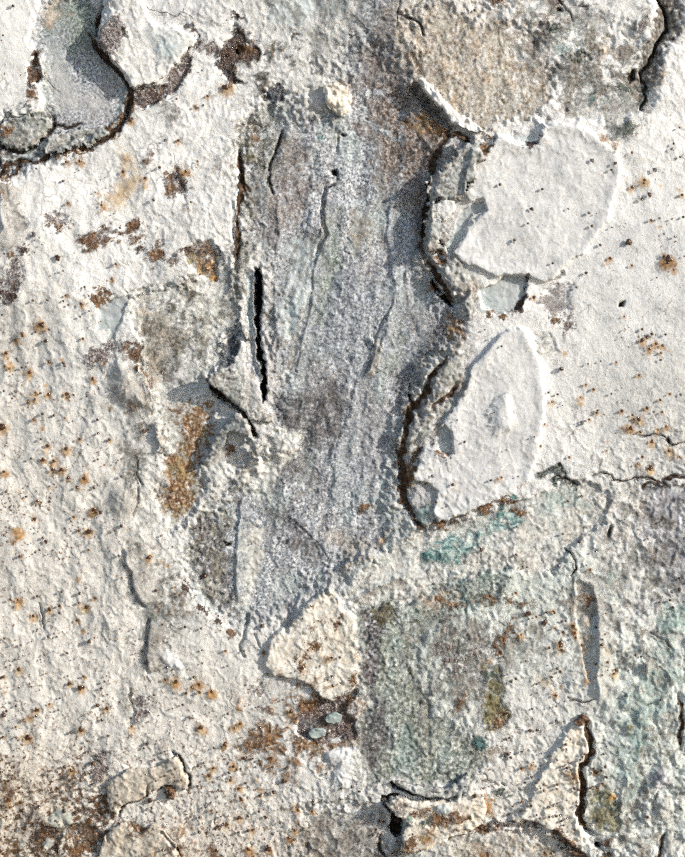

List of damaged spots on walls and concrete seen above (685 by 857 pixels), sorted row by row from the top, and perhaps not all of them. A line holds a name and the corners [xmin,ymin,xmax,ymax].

crack [0,80,81,177]
spalling [0,0,197,173]
crack [82,12,134,150]
crack [638,0,668,107]
spalling [88,0,685,625]
crack [398,355,458,530]
corrosion [11,515,58,571]
spalling [265,477,621,857]
water stain [415,587,547,711]
peeling [98,754,189,857]